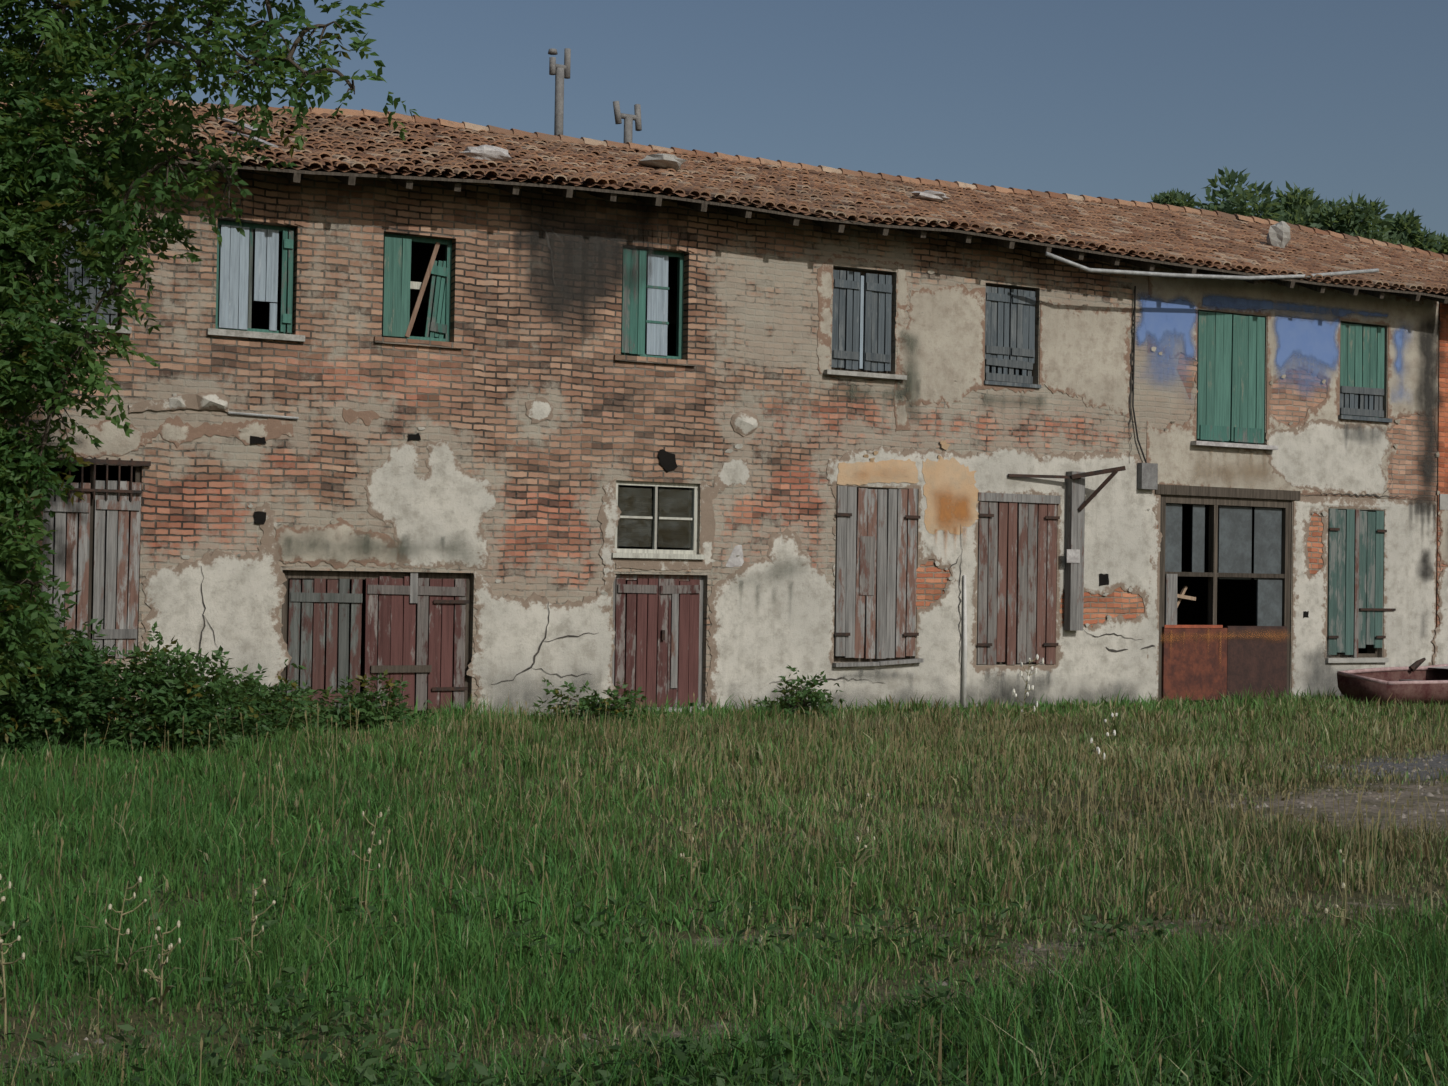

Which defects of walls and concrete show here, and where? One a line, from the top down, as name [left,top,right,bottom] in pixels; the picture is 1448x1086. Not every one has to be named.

water stain [517,202,651,313]
peeling [816,253,1388,432]
peeling [1395,330,1403,372]
peeling [57,404,294,458]
peeling [342,408,380,426]
peeling [525,397,553,423]
peeling [136,427,1162,716]
crack [199,566,217,675]
crack [491,602,597,685]